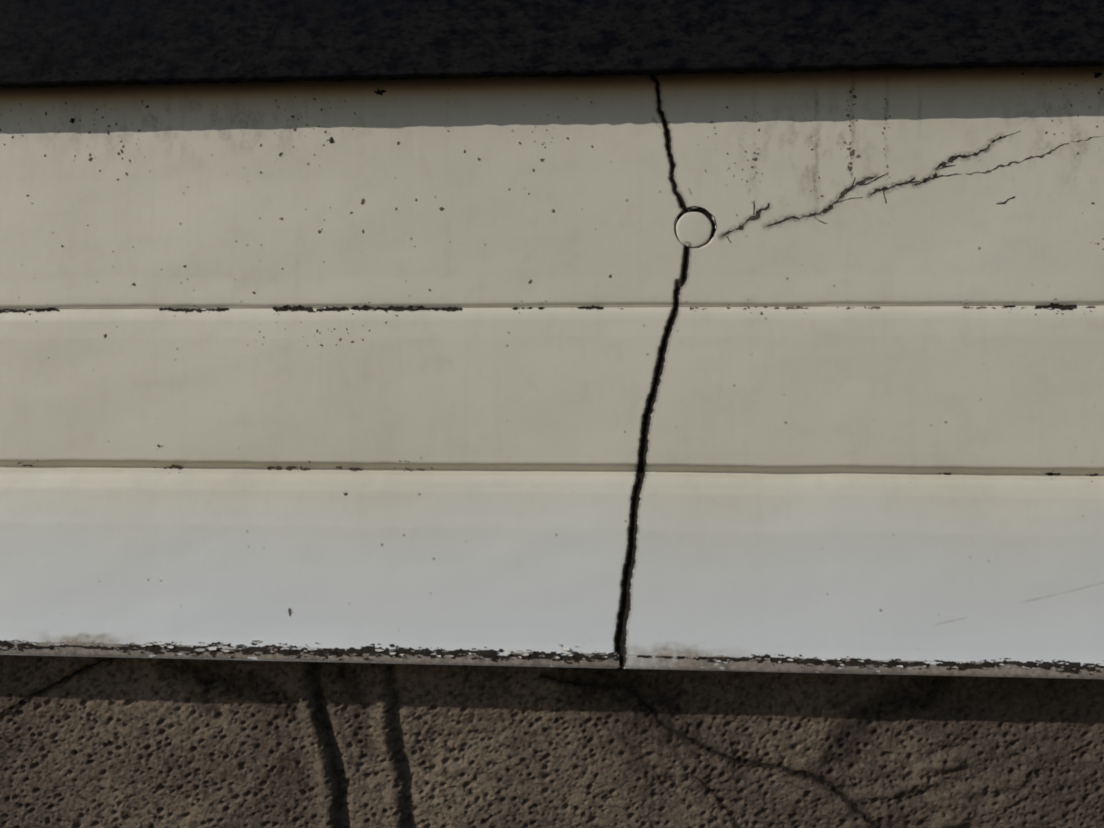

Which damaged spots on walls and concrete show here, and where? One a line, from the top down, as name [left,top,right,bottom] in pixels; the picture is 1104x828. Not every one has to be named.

crack [543,75,1102,828]
peeling [0,639,619,668]
peeling [637,654,1104,679]